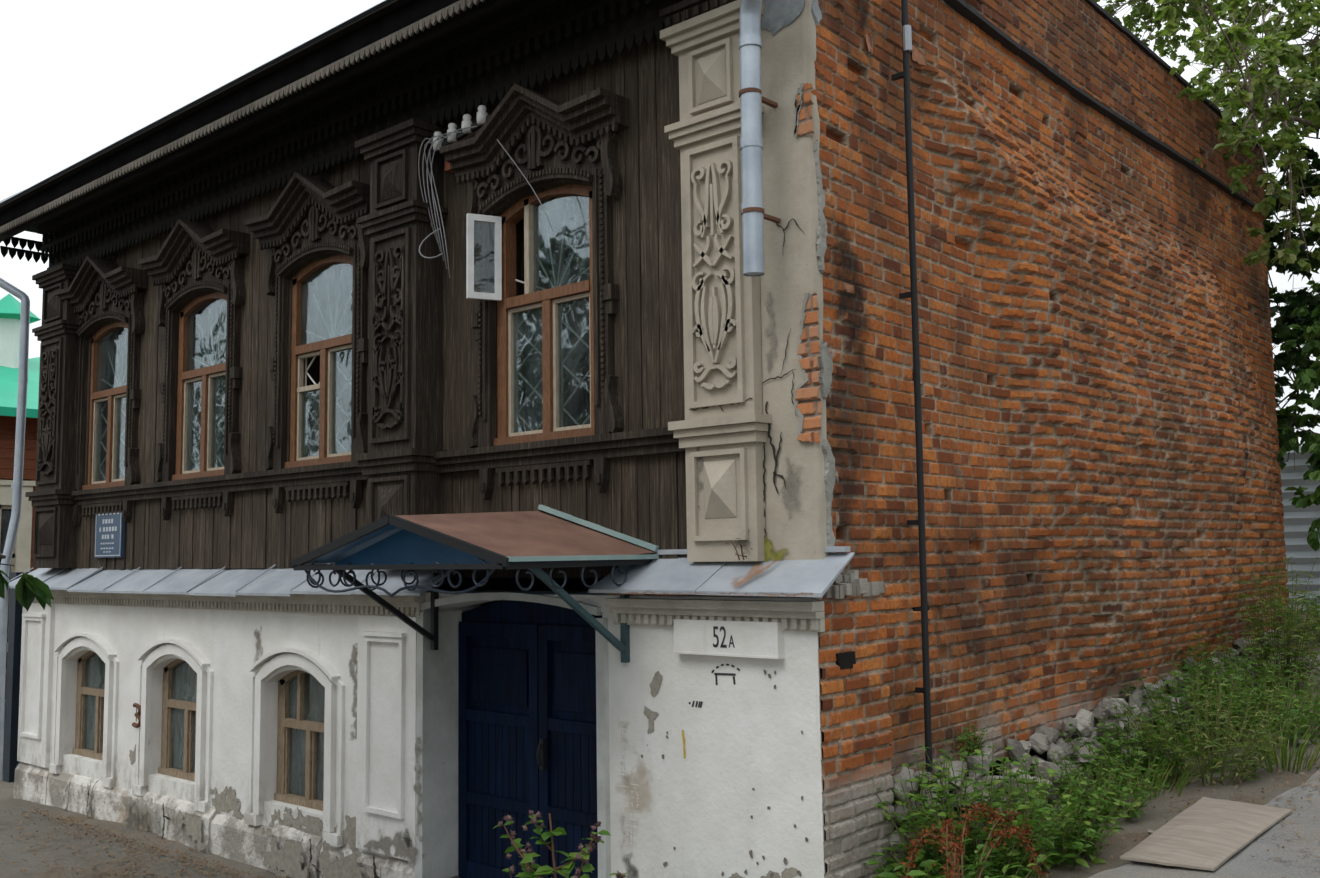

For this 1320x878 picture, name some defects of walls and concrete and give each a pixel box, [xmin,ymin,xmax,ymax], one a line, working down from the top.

flaking render [794,82,814,138]
flaking render [794,293,822,443]
peeling [123,797,208,852]
peeling [210,786,244,820]
peeling [261,807,366,878]
flaking render [721,850,801,878]